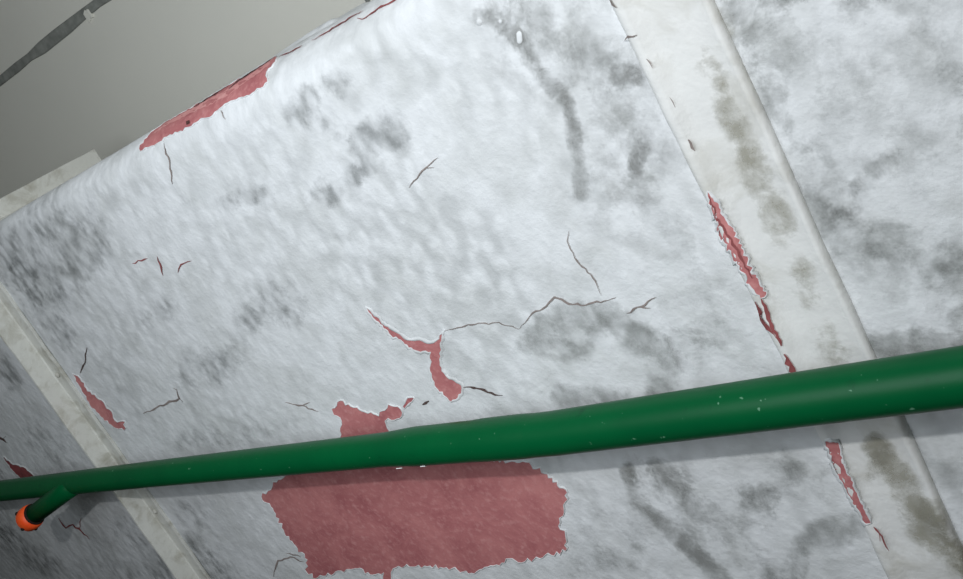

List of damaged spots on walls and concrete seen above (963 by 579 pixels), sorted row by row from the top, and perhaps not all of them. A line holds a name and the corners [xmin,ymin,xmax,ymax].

crack [280,0,395,56]
peeling [139,55,279,152]
crack [445,231,656,331]
peeling [706,190,796,373]
peeling [72,348,126,431]
peeling [331,396,429,438]
peeling [365,306,502,403]
peeling [3,456,35,478]
peeling [261,460,569,579]
peeling [823,438,872,527]